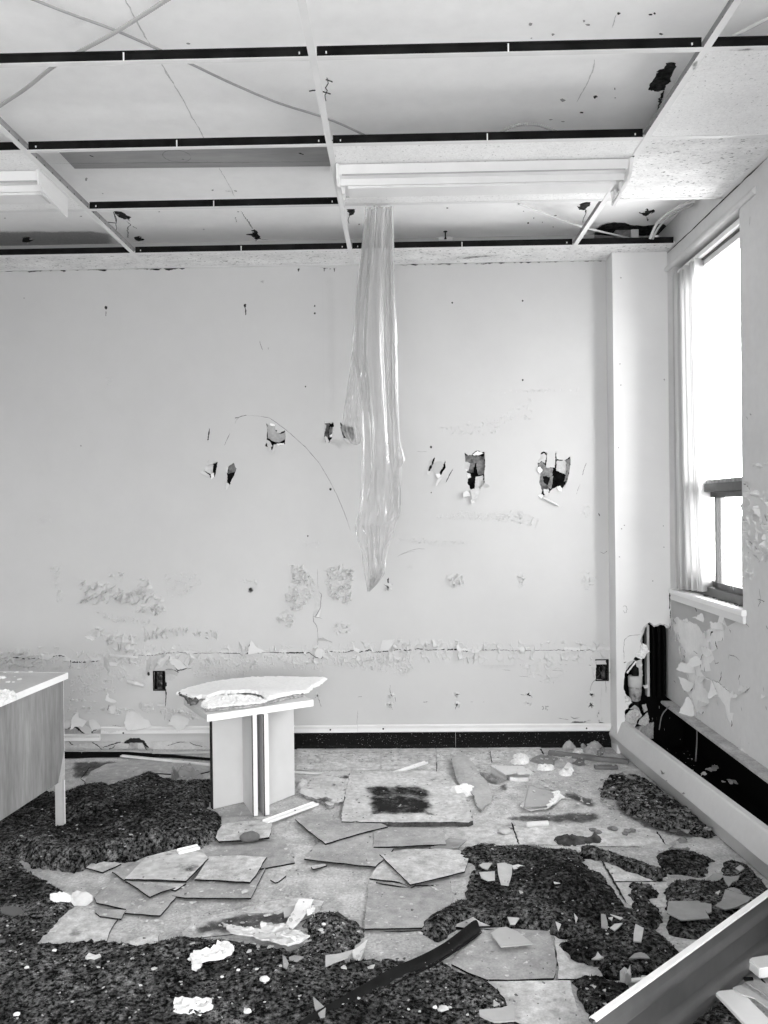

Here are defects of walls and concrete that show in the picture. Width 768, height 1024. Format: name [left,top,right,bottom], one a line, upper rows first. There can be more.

spalling [646,62,676,105]
spalling [266,423,286,454]
spalling [201,460,237,490]
spalling [463,451,490,503]
spalling [538,451,571,506]
peeling [740,454,768,606]
peeling [74,577,220,655]
peeling [275,562,356,637]
peeling [127,653,187,687]
peeling [201,694,268,709]
spalling [624,600,751,757]